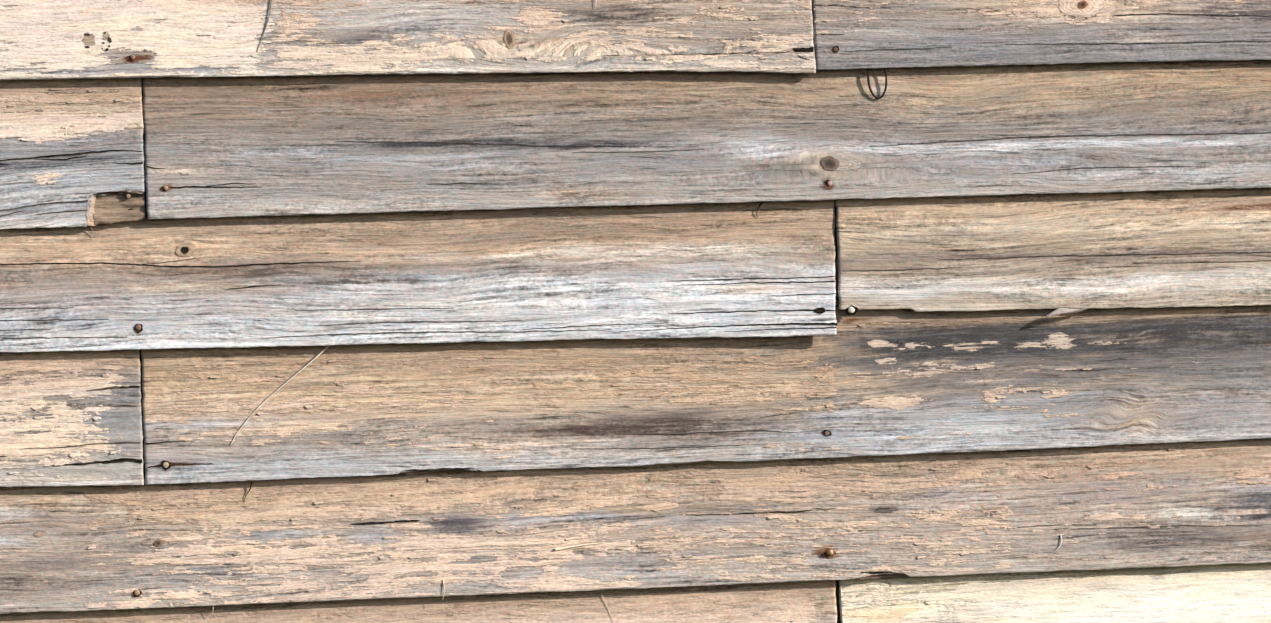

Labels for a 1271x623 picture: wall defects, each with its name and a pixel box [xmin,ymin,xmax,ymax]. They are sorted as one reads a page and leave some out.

peeling [18,172,61,186]
spalling [86,191,145,226]
peeling [1017,317,1126,372]
peeling [531,337,1093,421]
peeling [0,343,1271,623]
corrosion [815,546,838,558]